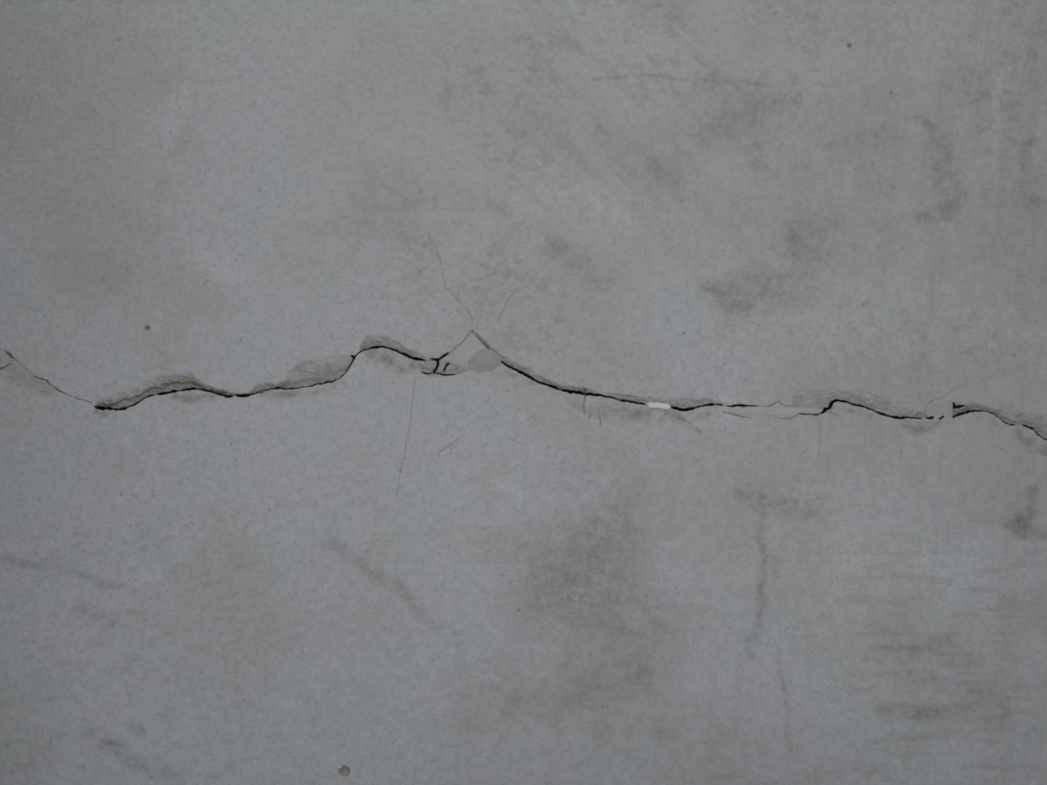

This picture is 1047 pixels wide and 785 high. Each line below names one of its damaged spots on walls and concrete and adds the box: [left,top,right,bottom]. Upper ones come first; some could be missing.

crack [0,236,1047,499]